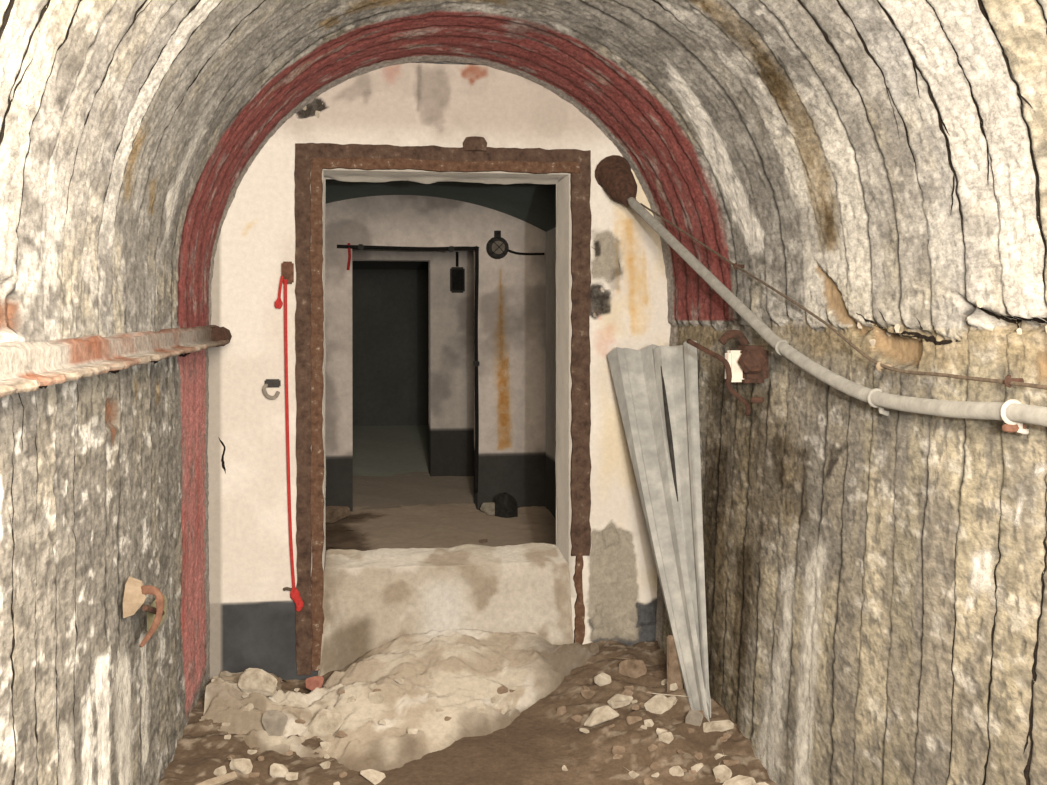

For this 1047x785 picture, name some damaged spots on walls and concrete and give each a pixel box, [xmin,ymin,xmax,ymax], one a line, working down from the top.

crack [975,0,1047,330]
flaking render [590,232,621,319]
spalling [816,265,923,364]
flaking render [589,523,657,646]
crack [1023,474,1047,785]